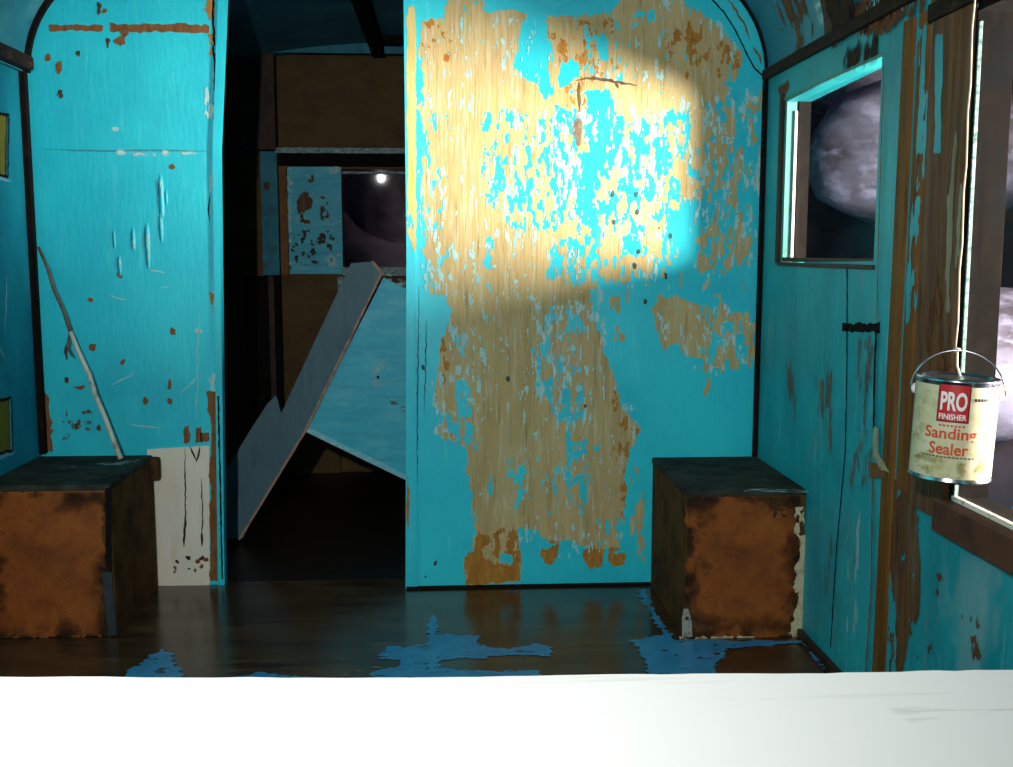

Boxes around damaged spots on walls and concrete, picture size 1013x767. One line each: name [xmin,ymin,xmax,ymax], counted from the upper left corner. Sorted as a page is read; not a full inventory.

rust [49,22,209,46]
crack [576,76,637,111]
peeling [906,22,963,323]
peeling [406,0,762,585]
peeling [887,479,921,672]